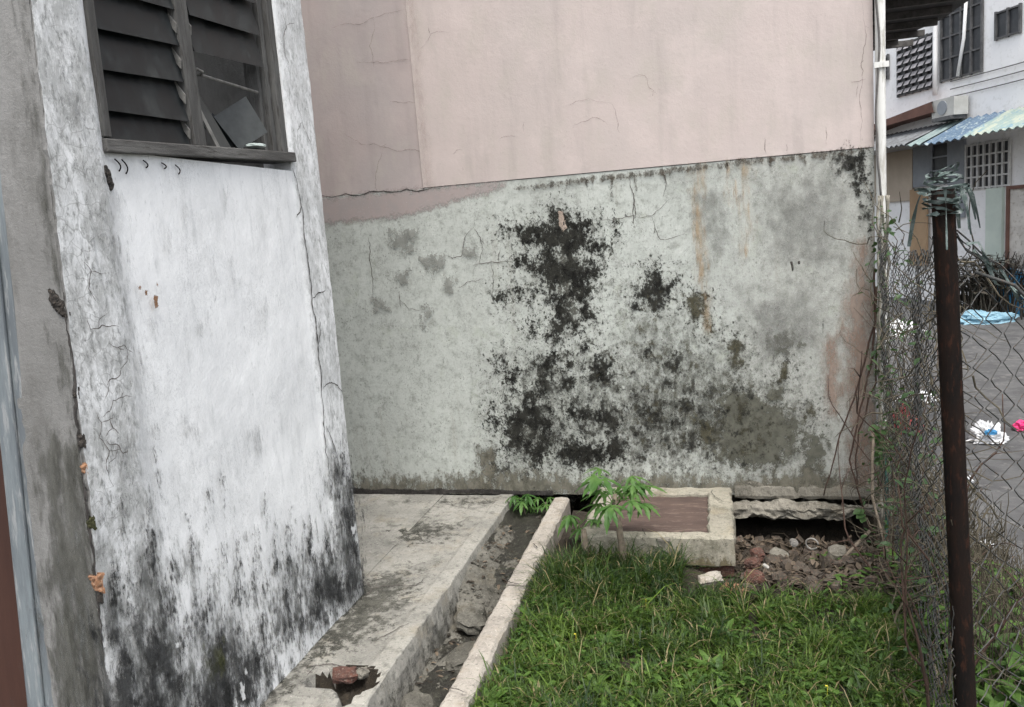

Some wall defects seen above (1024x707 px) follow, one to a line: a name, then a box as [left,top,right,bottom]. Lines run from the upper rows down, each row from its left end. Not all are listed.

crack [63,263,132,687]
crack [293,113,431,469]
damp [33,146,874,707]
spalling [734,480,878,500]